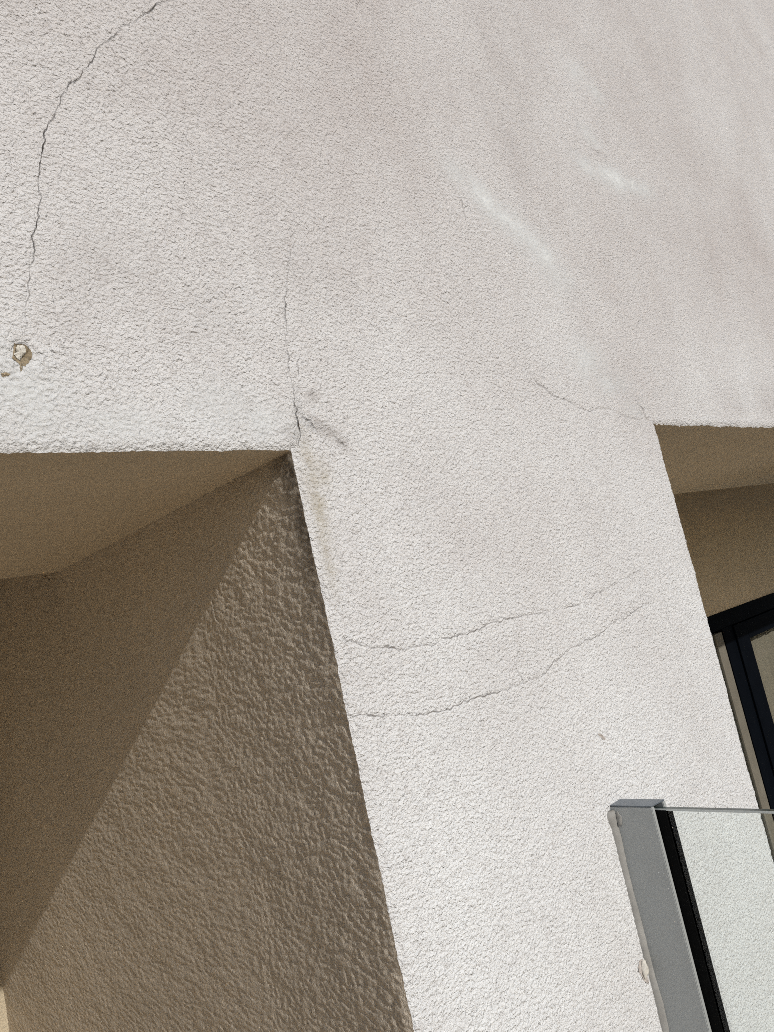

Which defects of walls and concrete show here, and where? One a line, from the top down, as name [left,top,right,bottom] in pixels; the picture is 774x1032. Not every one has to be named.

crack [29,1,165,280]
crack [418,692,499,715]